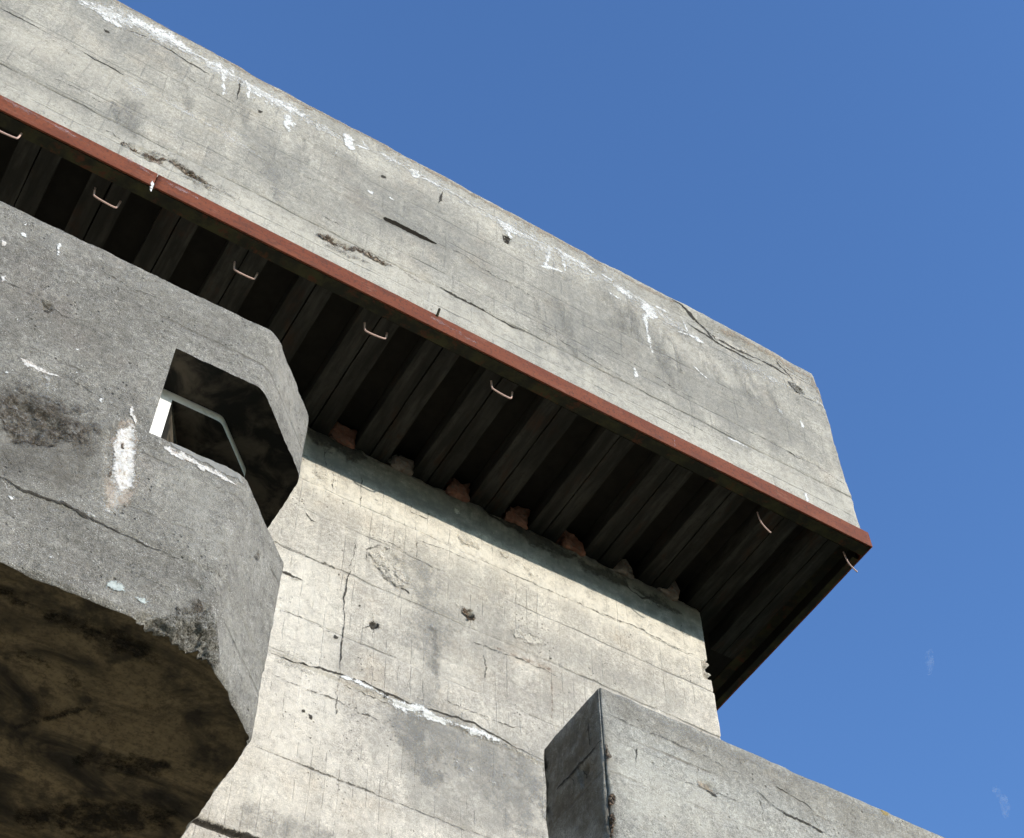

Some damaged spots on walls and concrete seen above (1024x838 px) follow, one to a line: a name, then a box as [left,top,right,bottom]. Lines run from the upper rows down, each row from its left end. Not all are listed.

spalling [121,142,234,198]
spalling [318,233,393,267]
spalling [383,217,437,244]
crack [672,299,804,380]
crack [0,476,183,561]
spalling [146,599,220,670]
crack [272,537,538,766]
water stain [74,753,170,777]
water stain [15,800,177,838]